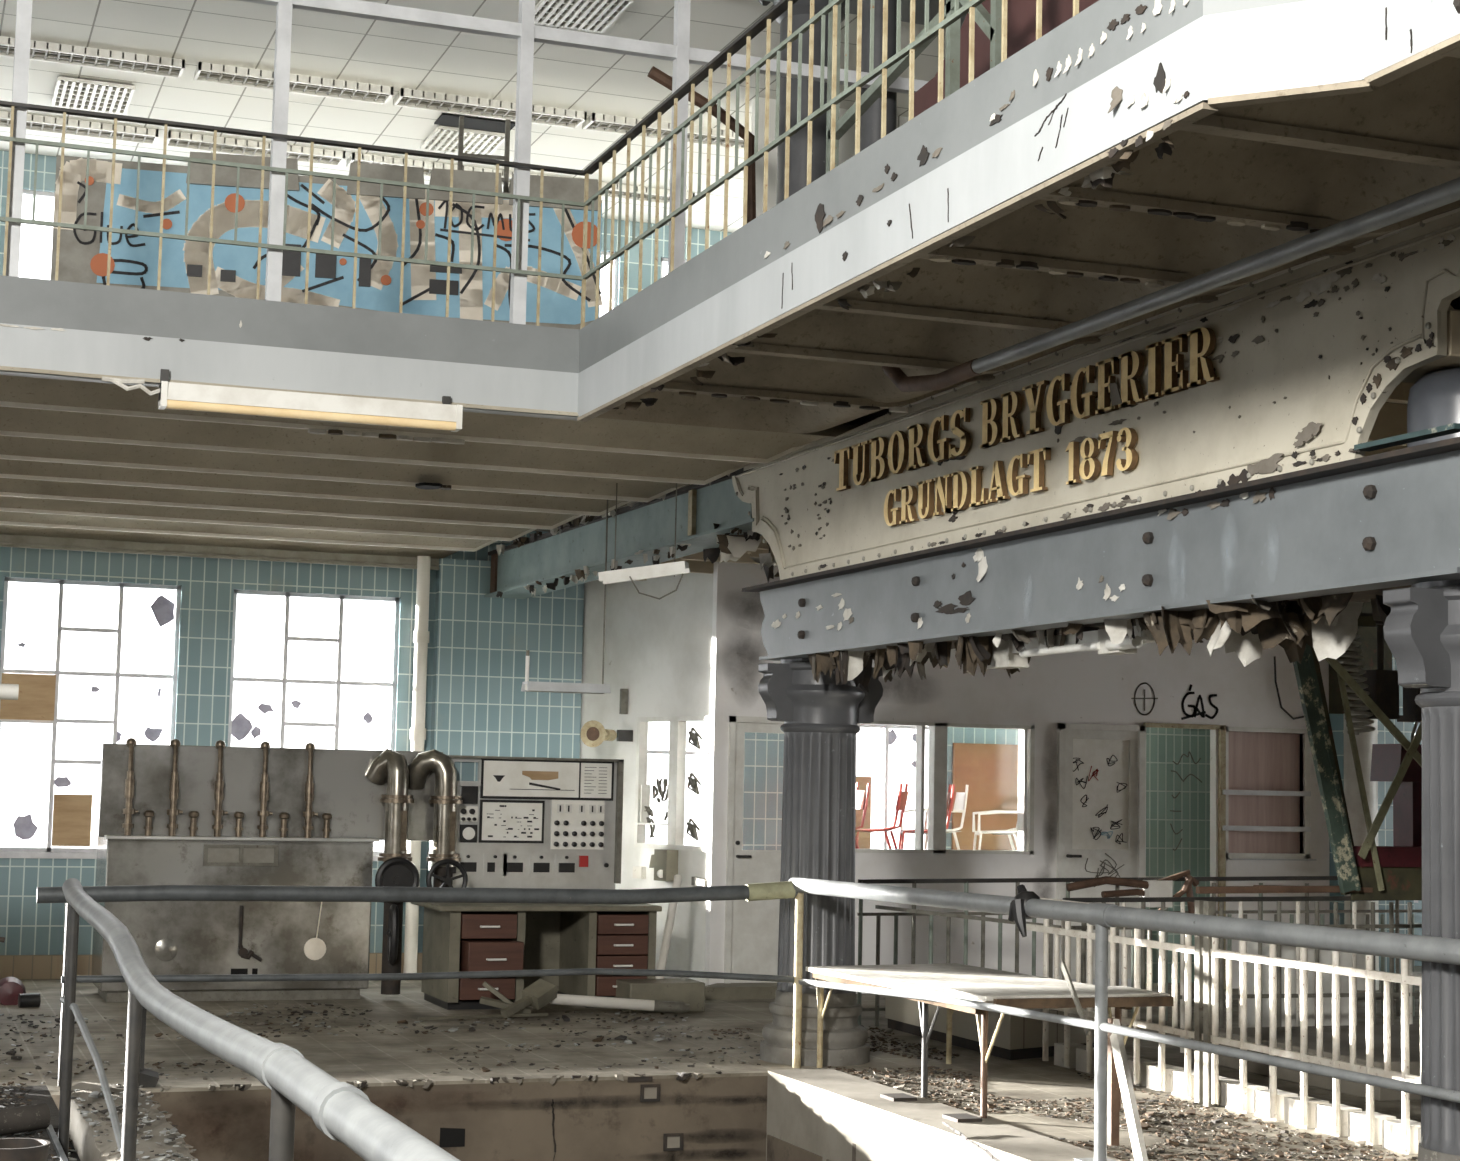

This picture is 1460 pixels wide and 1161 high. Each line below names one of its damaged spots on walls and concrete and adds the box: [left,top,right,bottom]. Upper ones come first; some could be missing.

peeling [1033,0,1189,86]
peeling [815,164,898,233]
peeling [917,145,943,166]
peeling [989,90,1015,126]
spalling [1035,62,1189,219]
spalling [838,236,976,310]
spalling [613,333,908,413]
peeling [1352,311,1434,425]
peeling [1158,422,1361,520]
peeling [496,492,672,556]
spalling [523,465,832,597]
peeling [808,500,1391,693]